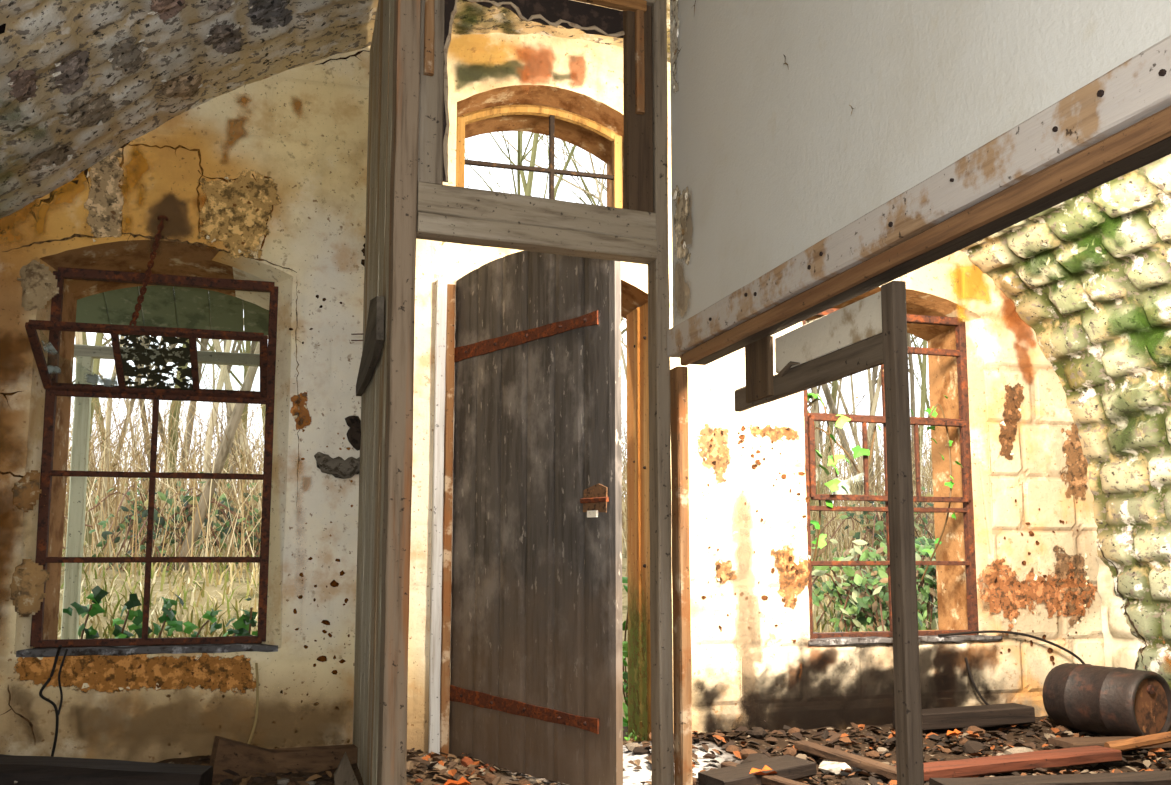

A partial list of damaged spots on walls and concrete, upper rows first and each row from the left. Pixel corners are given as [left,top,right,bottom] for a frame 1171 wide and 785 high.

crack [0,23,8,34]
damp [0,338,30,381]
peeling [697,423,799,487]
peeling [999,383,1024,460]
peeling [1060,423,1088,503]
damp [0,489,20,603]
damp [733,493,762,700]
peeling [701,546,810,613]
peeling [977,520,1098,654]
spalling [14,653,256,710]
damp [695,681,724,733]
damp [789,649,835,680]